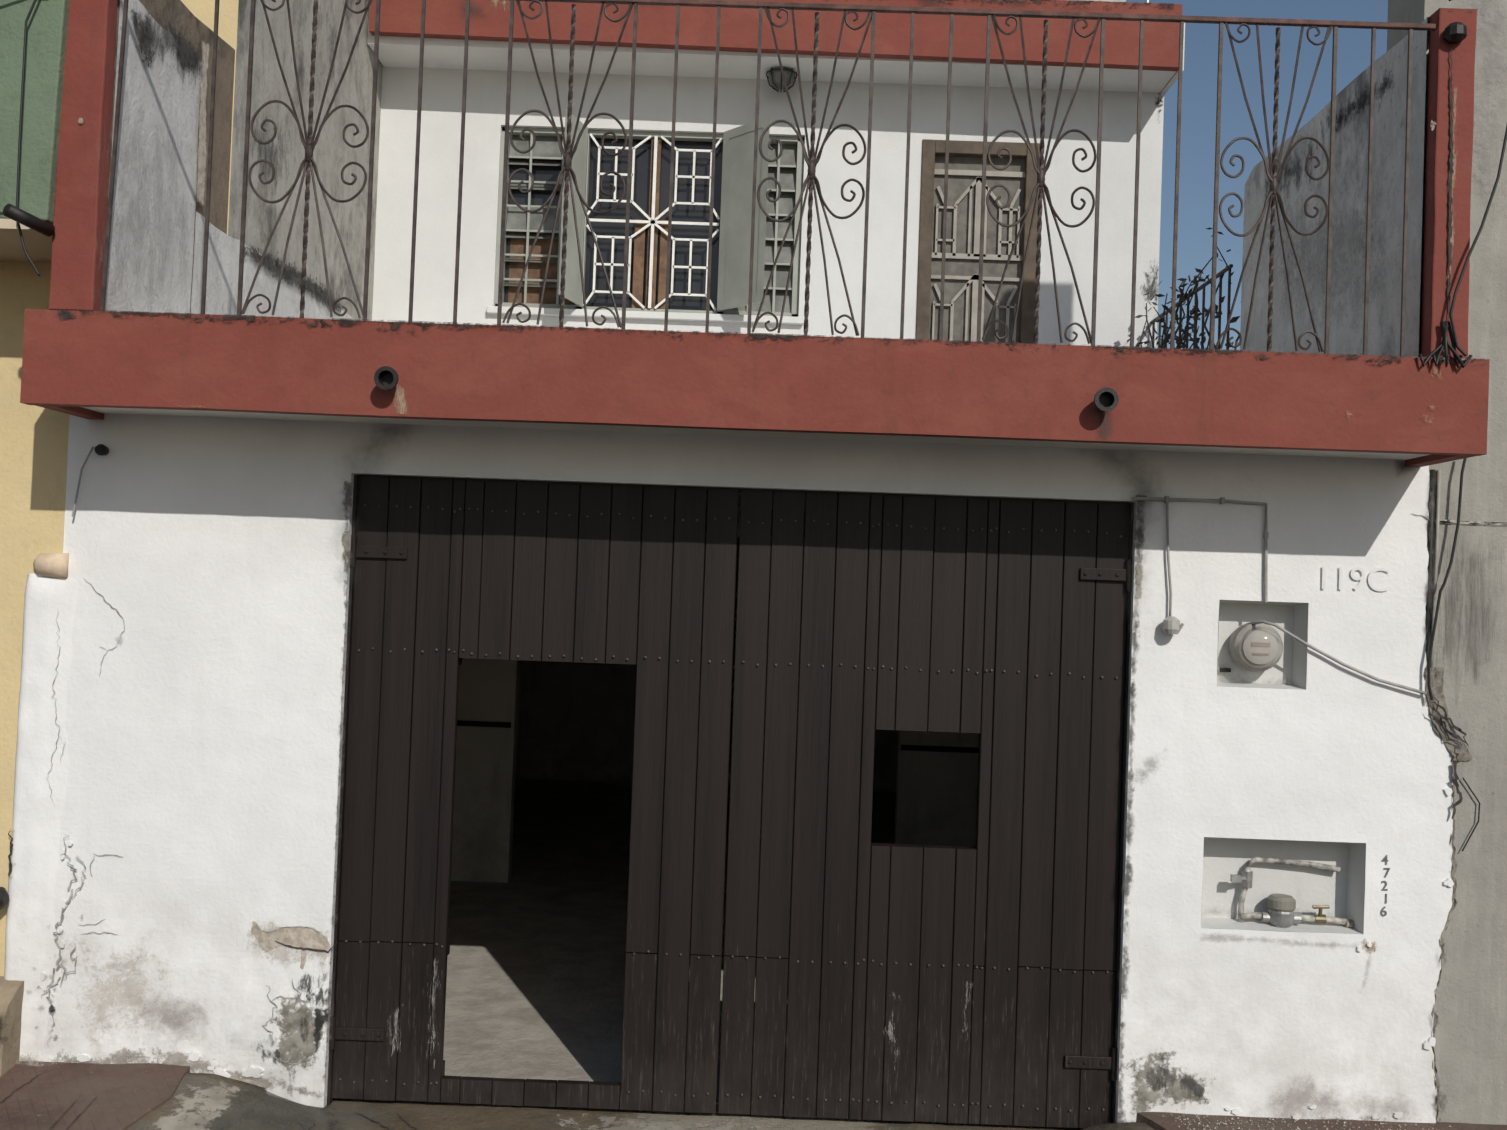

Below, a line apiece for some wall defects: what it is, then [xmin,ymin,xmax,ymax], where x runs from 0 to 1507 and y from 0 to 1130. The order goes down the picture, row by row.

damp [133,9,206,81]
crack [85,580,125,673]
damp [1121,613,1138,929]
crack [1,610,122,1102]
flaking render [251,921,335,969]
damp [257,974,333,1074]
damp [1120,948,1129,1003]
spalling [1422,667,1472,1123]
damp [1104,1022,1208,1130]